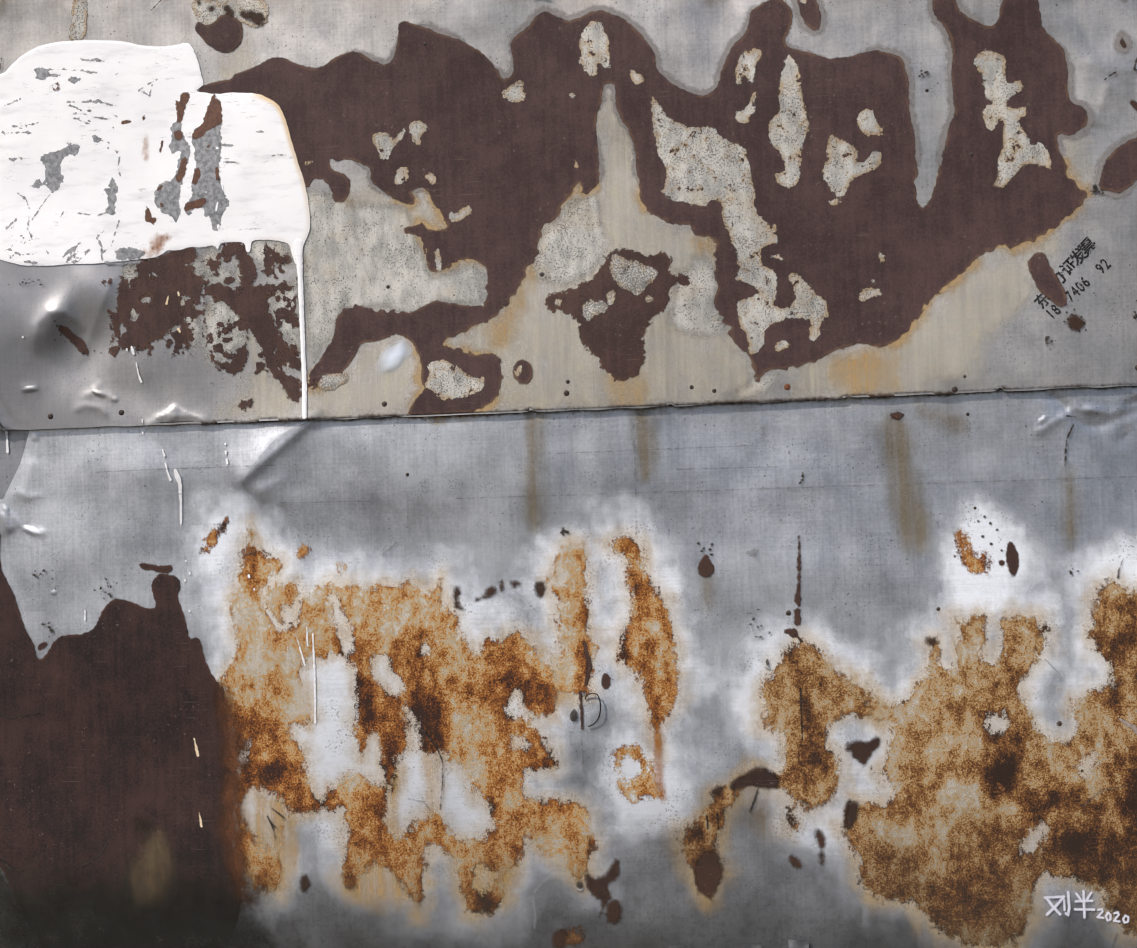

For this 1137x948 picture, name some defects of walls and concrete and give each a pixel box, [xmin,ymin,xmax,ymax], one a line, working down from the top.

peeling [145,92,235,231]
rust [199,516,229,554]
rust [0,528,622,930]
rust [608,535,680,804]
rust [676,536,1137,948]
rust [953,515,1019,576]